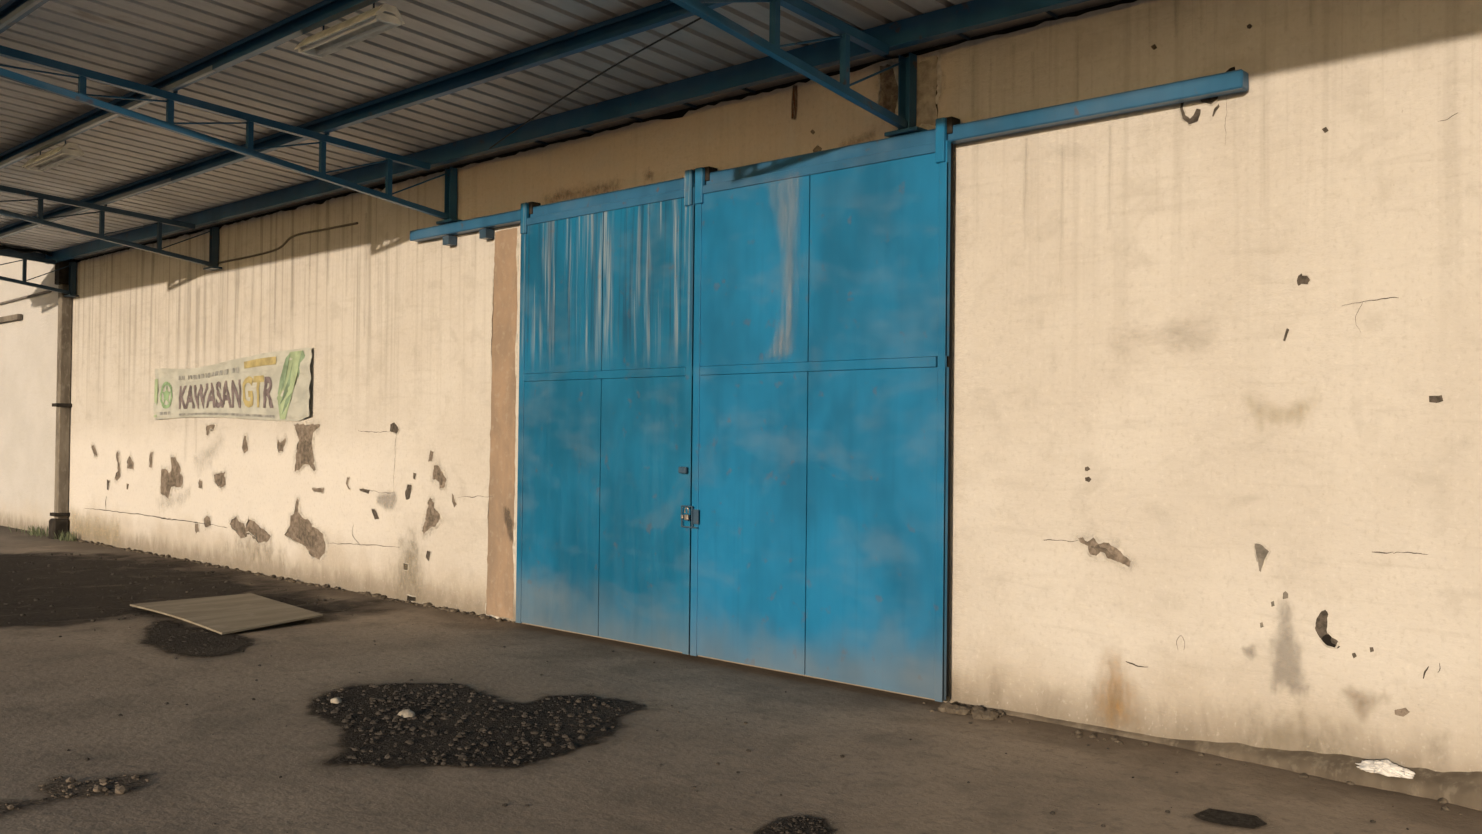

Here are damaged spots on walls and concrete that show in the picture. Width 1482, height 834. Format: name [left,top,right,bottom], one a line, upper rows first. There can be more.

spalling [107,450,226,502]
spalling [195,515,211,534]
spalling [229,422,328,561]
spalling [346,477,379,519]
spalling [405,450,457,561]
spalling [1078,534,1131,569]
spalling [1253,542,1271,572]
spalling [1315,610,1374,658]